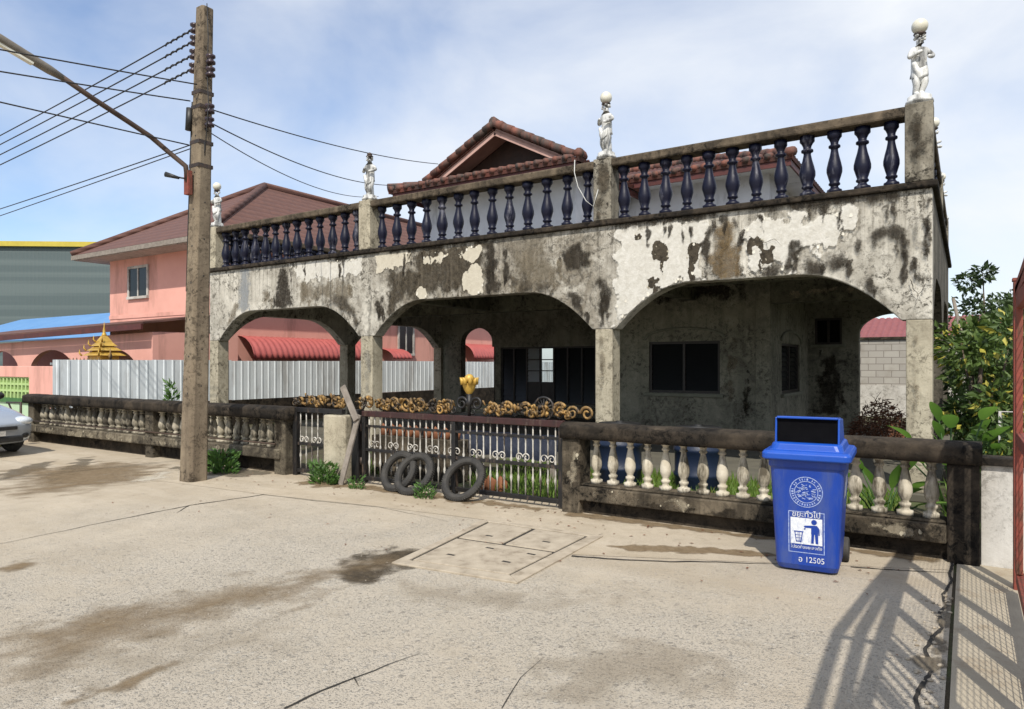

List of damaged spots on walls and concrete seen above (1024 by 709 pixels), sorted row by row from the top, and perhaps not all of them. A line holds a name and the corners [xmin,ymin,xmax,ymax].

peeling [375,245,484,295]
water stain [263,240,611,386]
peeling [611,219,710,328]
water stain [618,213,748,303]
peeling [743,203,859,276]
water stain [750,191,932,285]
water stain [304,550,416,584]
water stain [33,587,290,656]